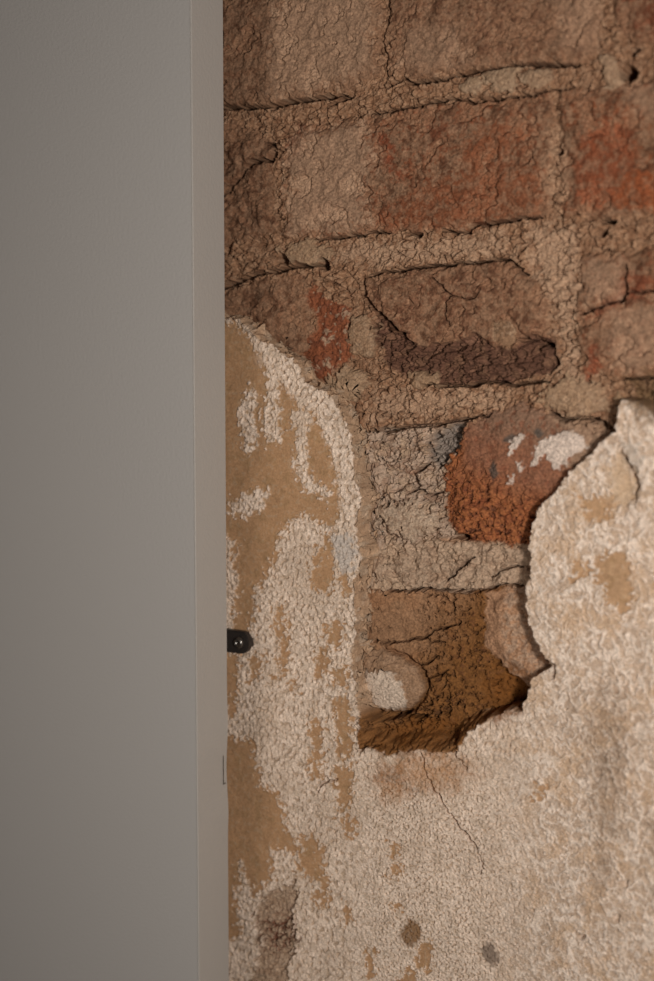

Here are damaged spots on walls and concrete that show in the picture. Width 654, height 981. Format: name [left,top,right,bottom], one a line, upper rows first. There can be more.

flaking render [223,0,654,841]
crack [422,754,483,870]